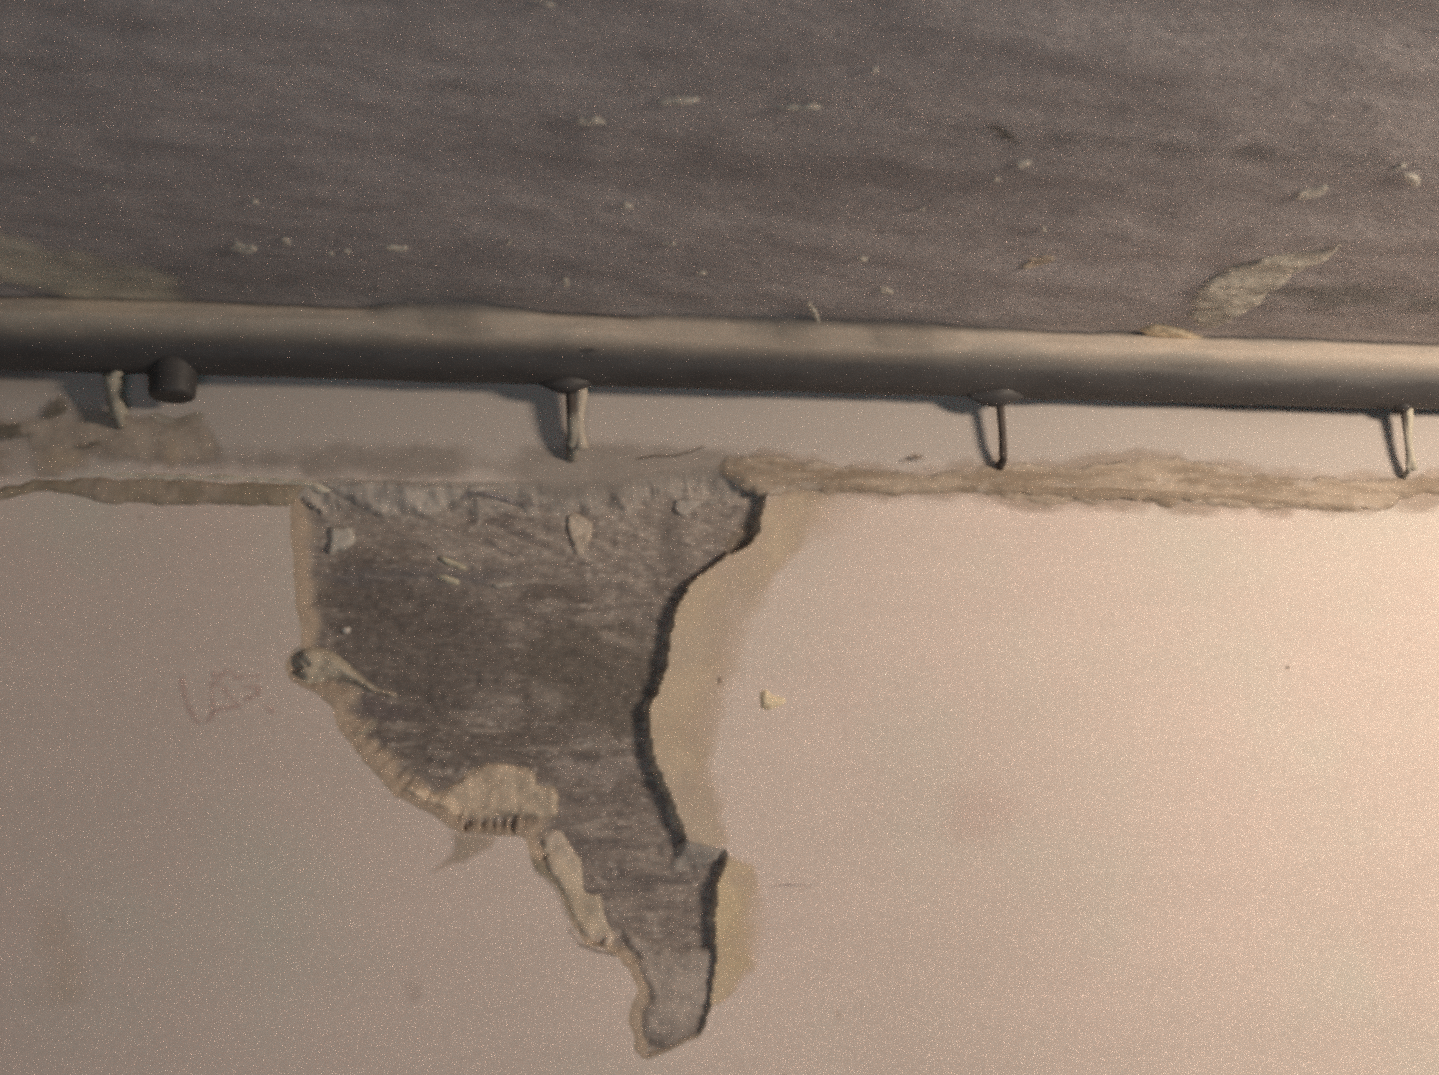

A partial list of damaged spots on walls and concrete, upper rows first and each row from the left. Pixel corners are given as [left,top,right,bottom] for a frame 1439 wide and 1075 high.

spalling [0,452,1439,1060]